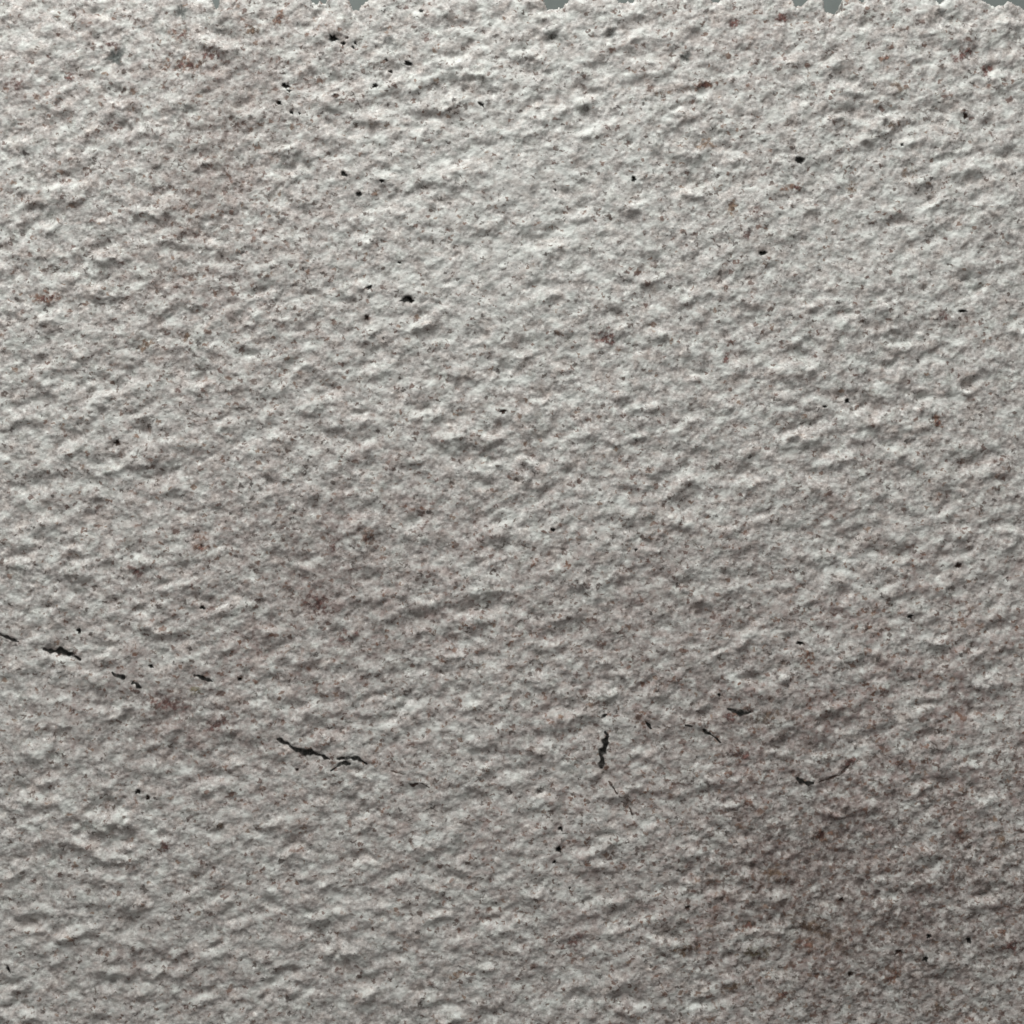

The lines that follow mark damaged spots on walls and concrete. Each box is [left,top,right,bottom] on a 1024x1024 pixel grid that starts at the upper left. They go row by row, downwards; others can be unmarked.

crack [43,646,81,661]
crack [111,672,141,688]
crack [193,674,213,682]
crack [727,708,751,716]
crack [685,725,721,743]
crack [276,737,367,771]
crack [598,714,633,815]
crack [796,766,849,786]